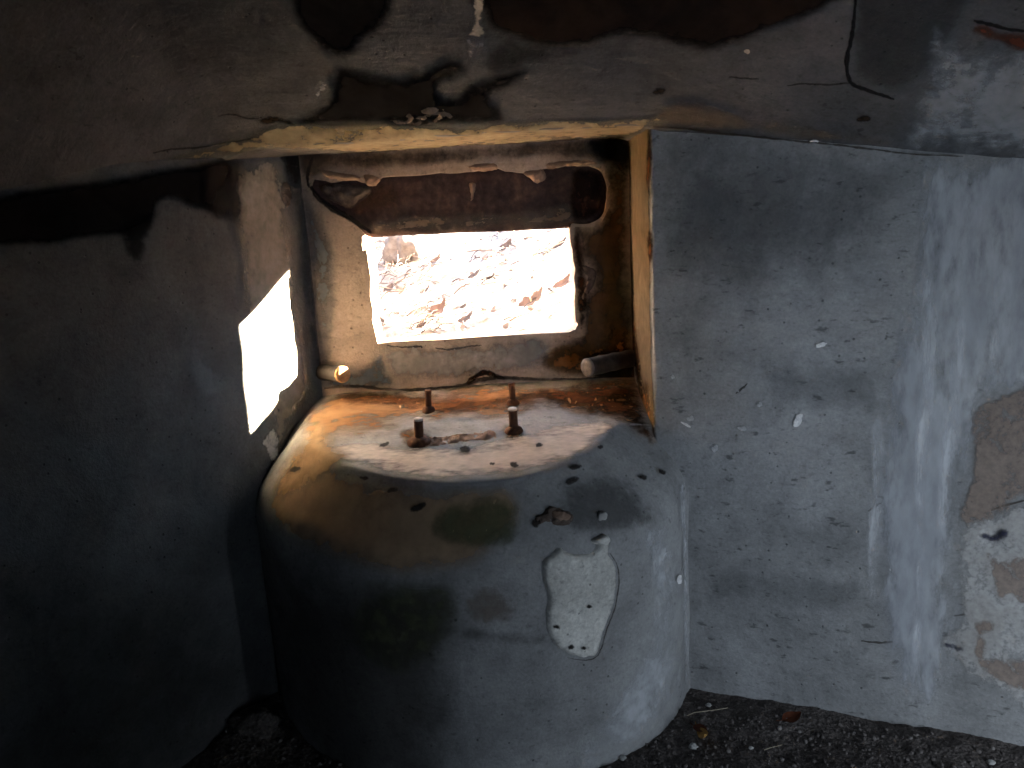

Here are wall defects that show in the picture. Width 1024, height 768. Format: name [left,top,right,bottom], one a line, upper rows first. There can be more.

crack [787,0,894,100]
spalling [390,107,453,126]
spalling [312,160,607,238]
rust [305,148,653,443]
peeling [944,508,1024,708]